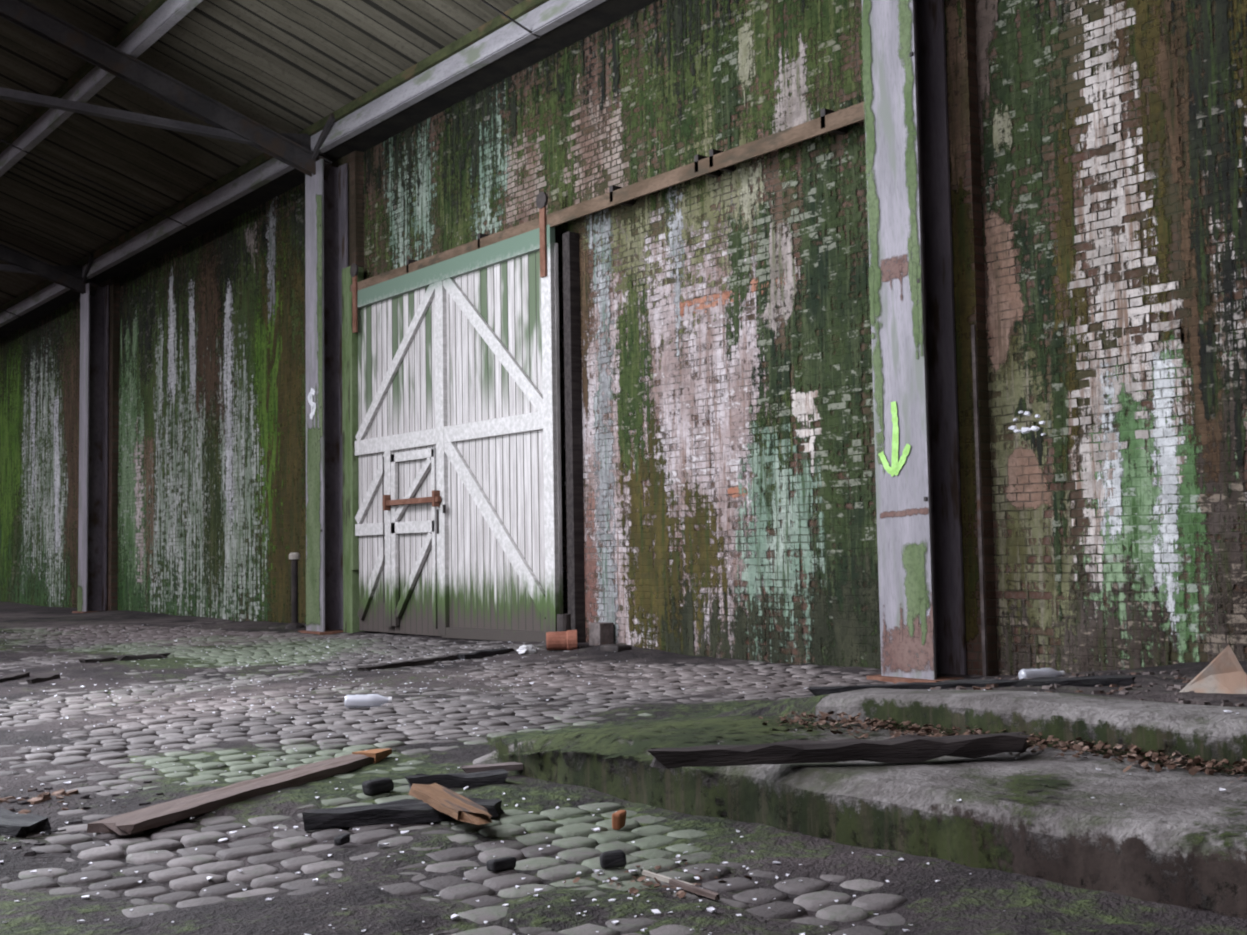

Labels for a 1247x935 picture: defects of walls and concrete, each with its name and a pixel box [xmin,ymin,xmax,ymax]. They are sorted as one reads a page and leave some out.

damp [363,0,757,269]
spalling [1068,0,1126,68]
damp [0,305,79,607]
damp [119,182,305,622]
spalling [674,271,797,318]
peeling [791,389,821,476]
damp [996,0,1247,675]